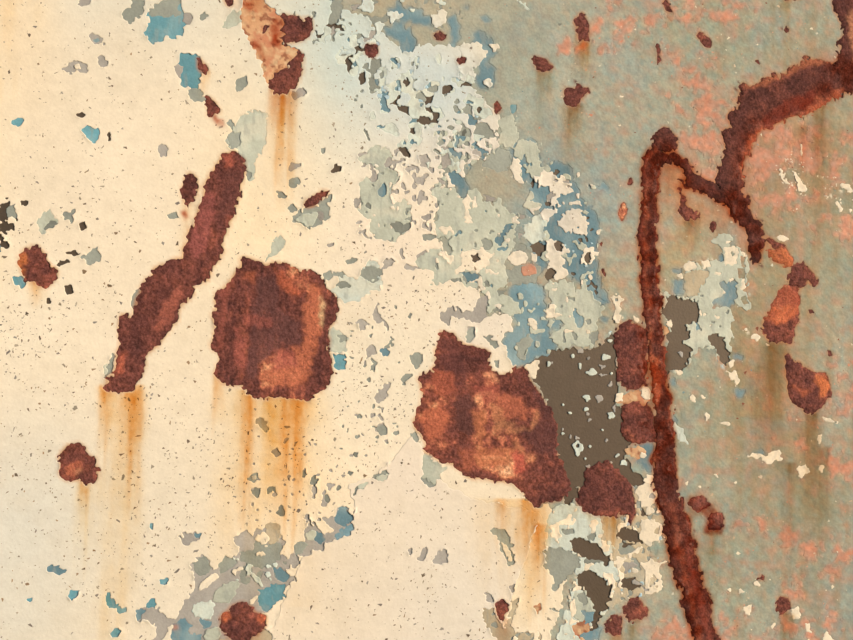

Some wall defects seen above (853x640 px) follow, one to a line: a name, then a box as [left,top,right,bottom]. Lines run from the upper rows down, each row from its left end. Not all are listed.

peeling [122,0,208,45]
peeling [174,53,220,117]
peeling [222,0,298,83]
corrosion [268,13,313,95]
corrosion [17,244,58,289]
corrosion [103,151,247,394]
corrosion [211,256,339,401]
peeling [659,221,751,398]
corrosion [57,442,101,486]
corrosion [412,330,636,526]
peeling [106,463,355,640]
peeling [482,584,542,640]